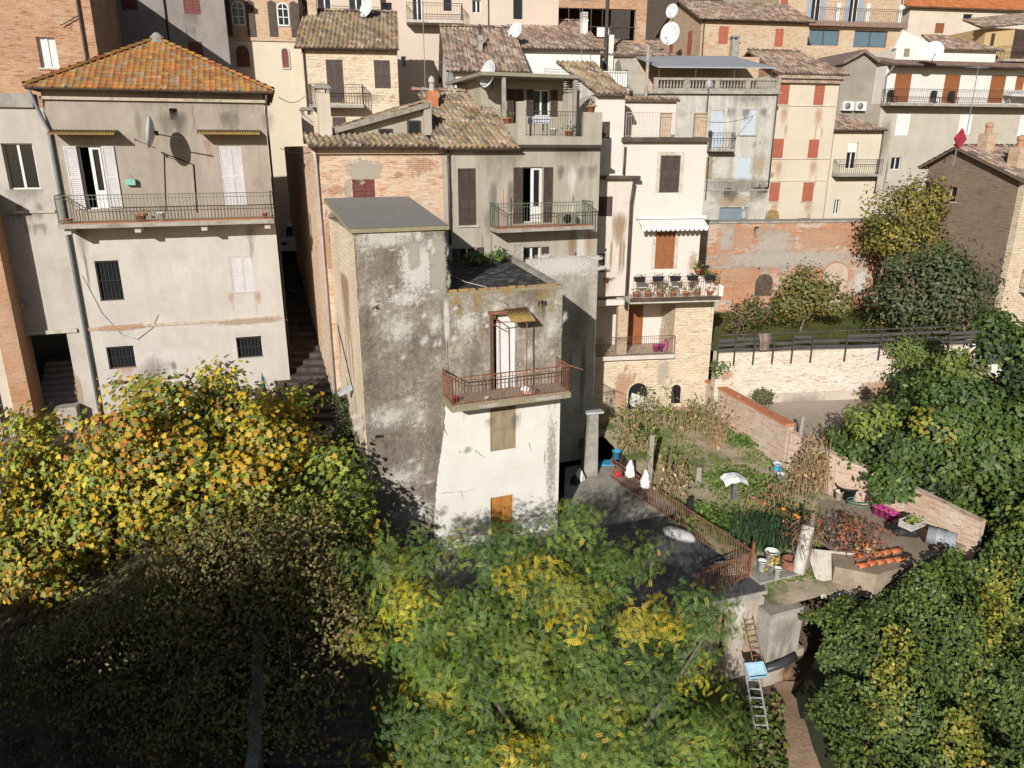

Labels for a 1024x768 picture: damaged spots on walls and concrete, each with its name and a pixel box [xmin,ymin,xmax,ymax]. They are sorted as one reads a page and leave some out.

leakage [610,216,625,267]
peeling [323,210,507,360]
peeling [349,395,427,436]